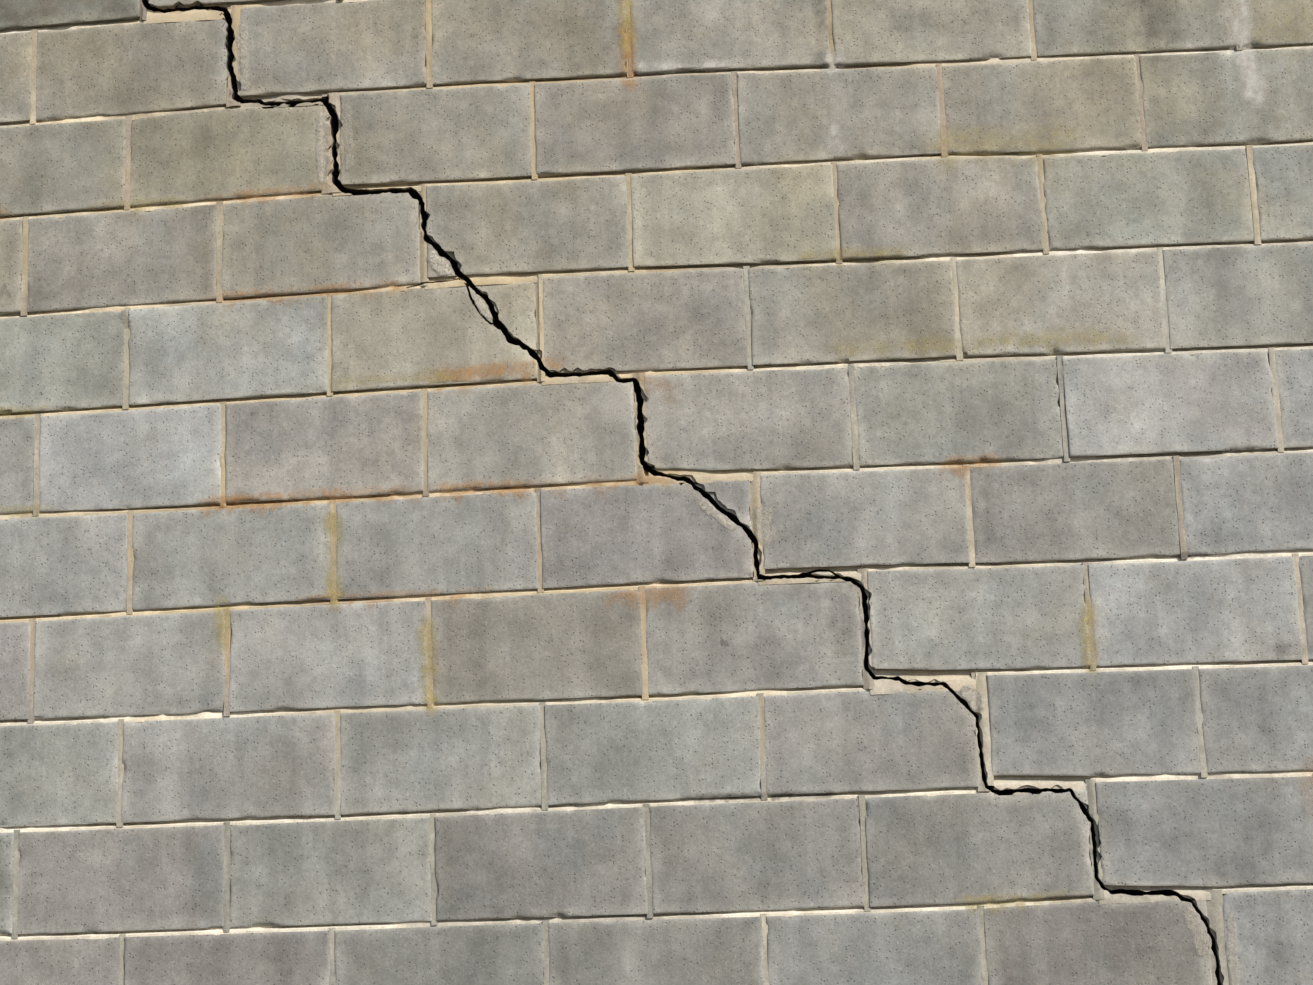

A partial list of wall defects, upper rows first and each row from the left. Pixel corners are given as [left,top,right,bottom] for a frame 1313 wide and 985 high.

crack [142,0,805,580]
crack [805,569,1221,985]